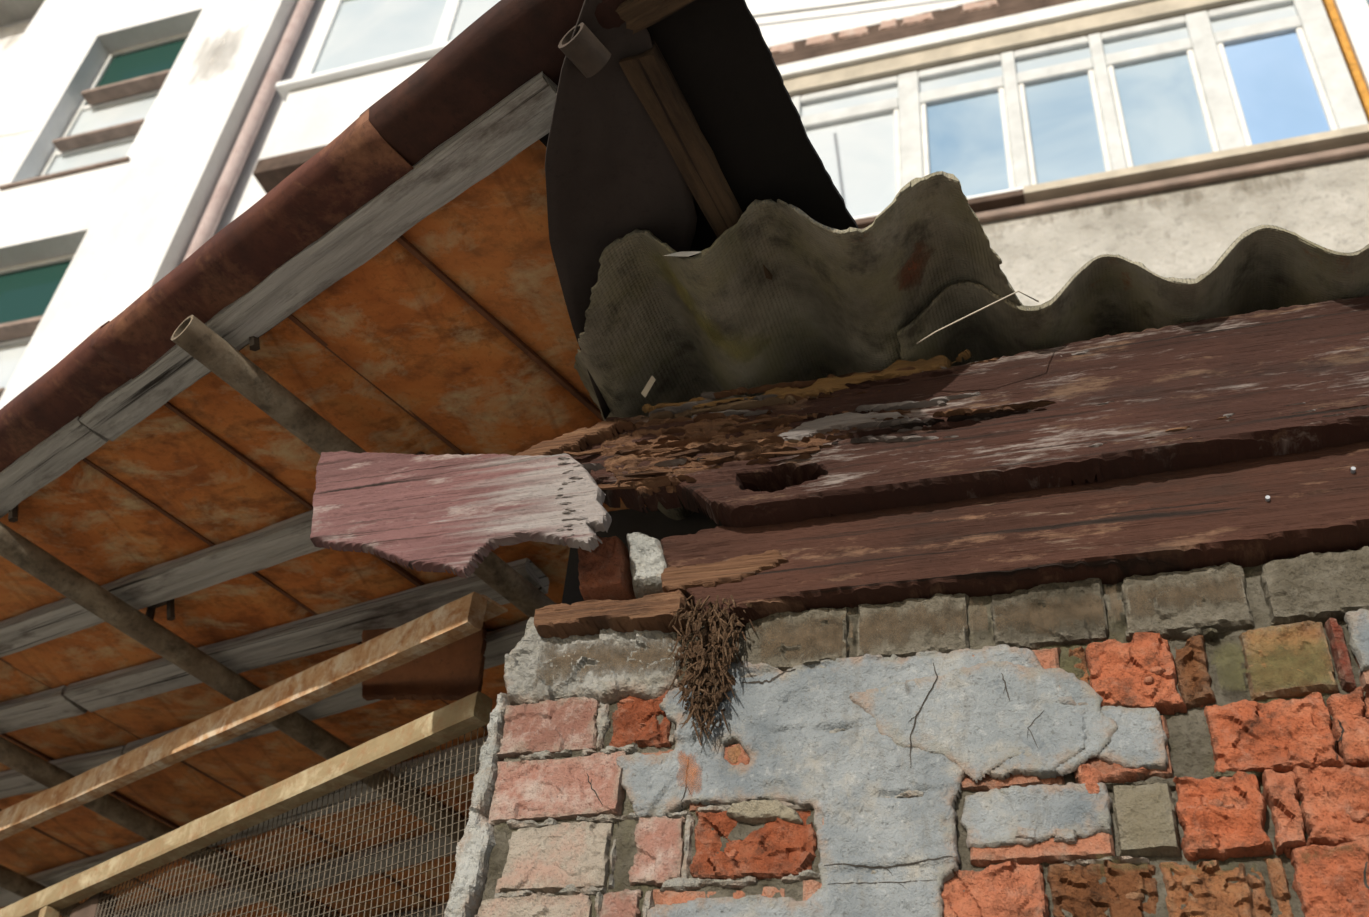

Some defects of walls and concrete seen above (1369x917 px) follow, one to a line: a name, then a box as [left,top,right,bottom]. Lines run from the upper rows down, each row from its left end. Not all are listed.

crack [908,663,938,768]
flaking render [609,609,1369,917]